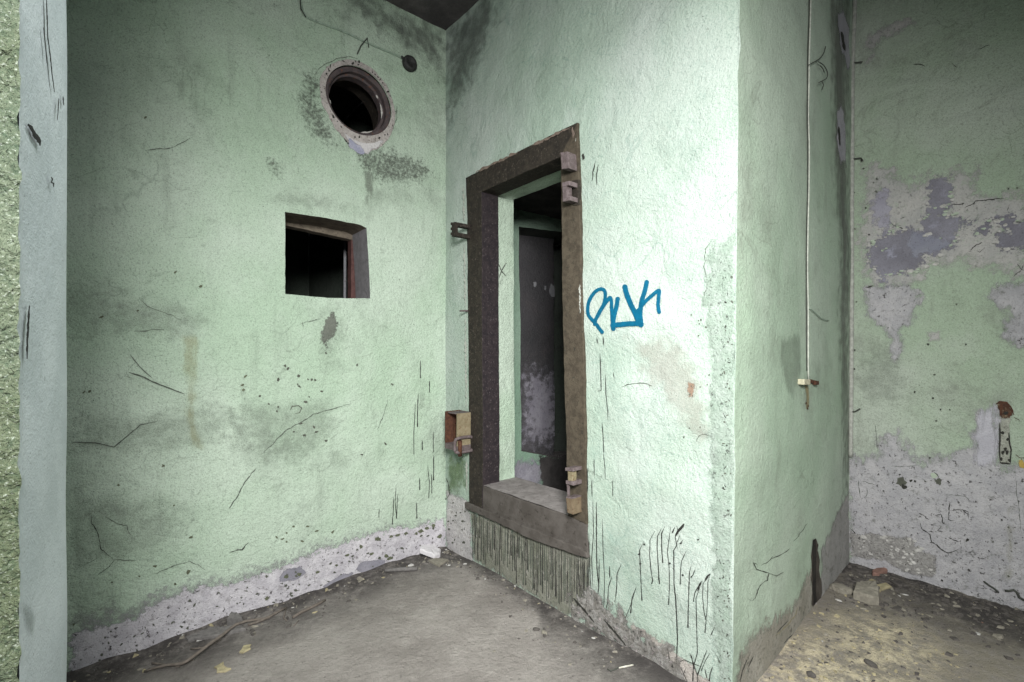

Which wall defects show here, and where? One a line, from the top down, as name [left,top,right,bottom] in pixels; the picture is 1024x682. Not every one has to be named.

peeling [854,161,1024,360]
crack [88,515,133,575]
peeling [69,460,473,671]
spalling [565,235,735,682]
crack [749,523,808,600]
peeling [811,409,1024,611]
rust [996,401,1014,419]